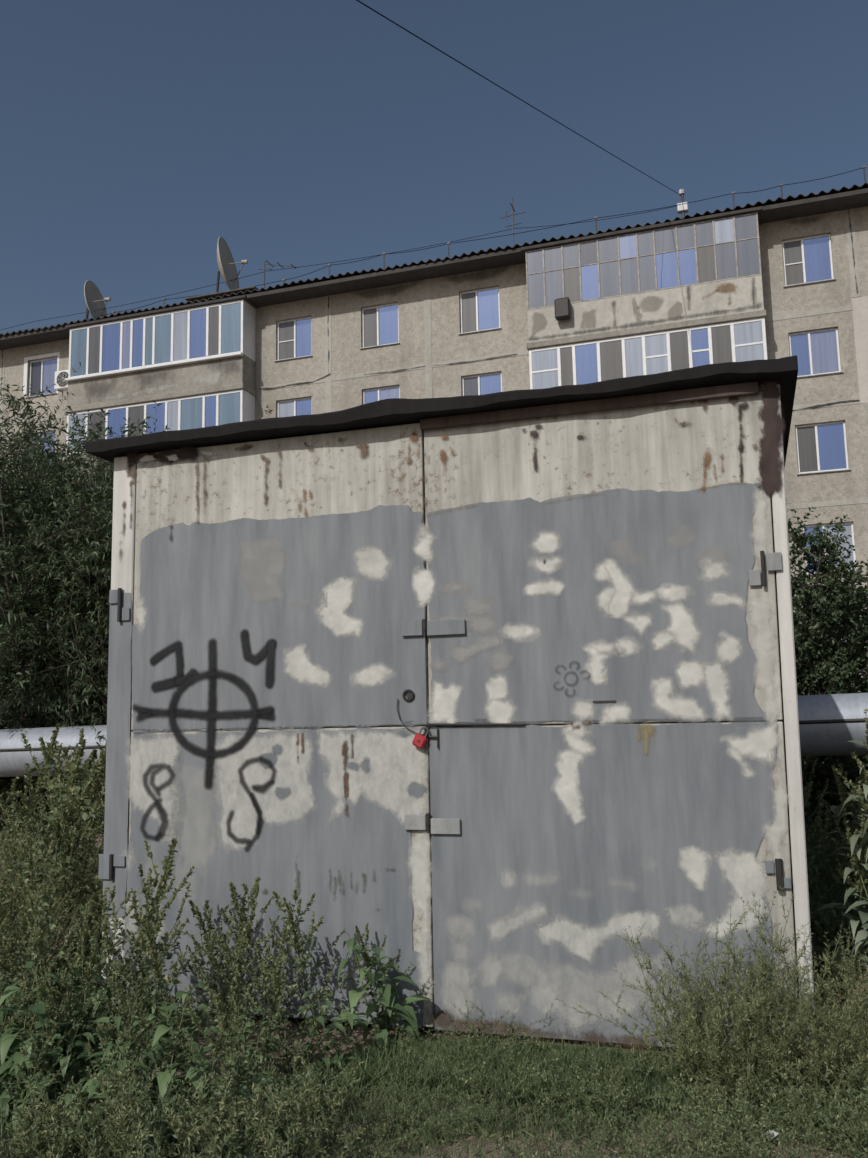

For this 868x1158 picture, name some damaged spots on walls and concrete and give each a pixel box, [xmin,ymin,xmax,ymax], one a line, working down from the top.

corrosion [122,465,135,532]
corrosion [195,458,208,523]
corrosion [235,445,281,504]
corrosion [522,424,542,471]